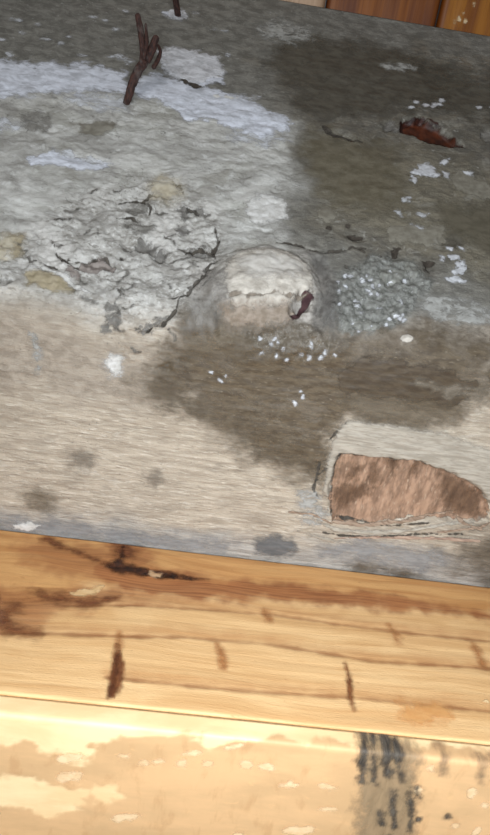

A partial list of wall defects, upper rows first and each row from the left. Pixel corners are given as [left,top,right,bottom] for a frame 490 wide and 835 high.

efflorescence [26,149,112,171]
efflorescence [0,59,290,148]
water stain [271,36,490,119]
rust [399,117,440,134]
crack [13,181,220,353]
water stain [148,311,490,483]